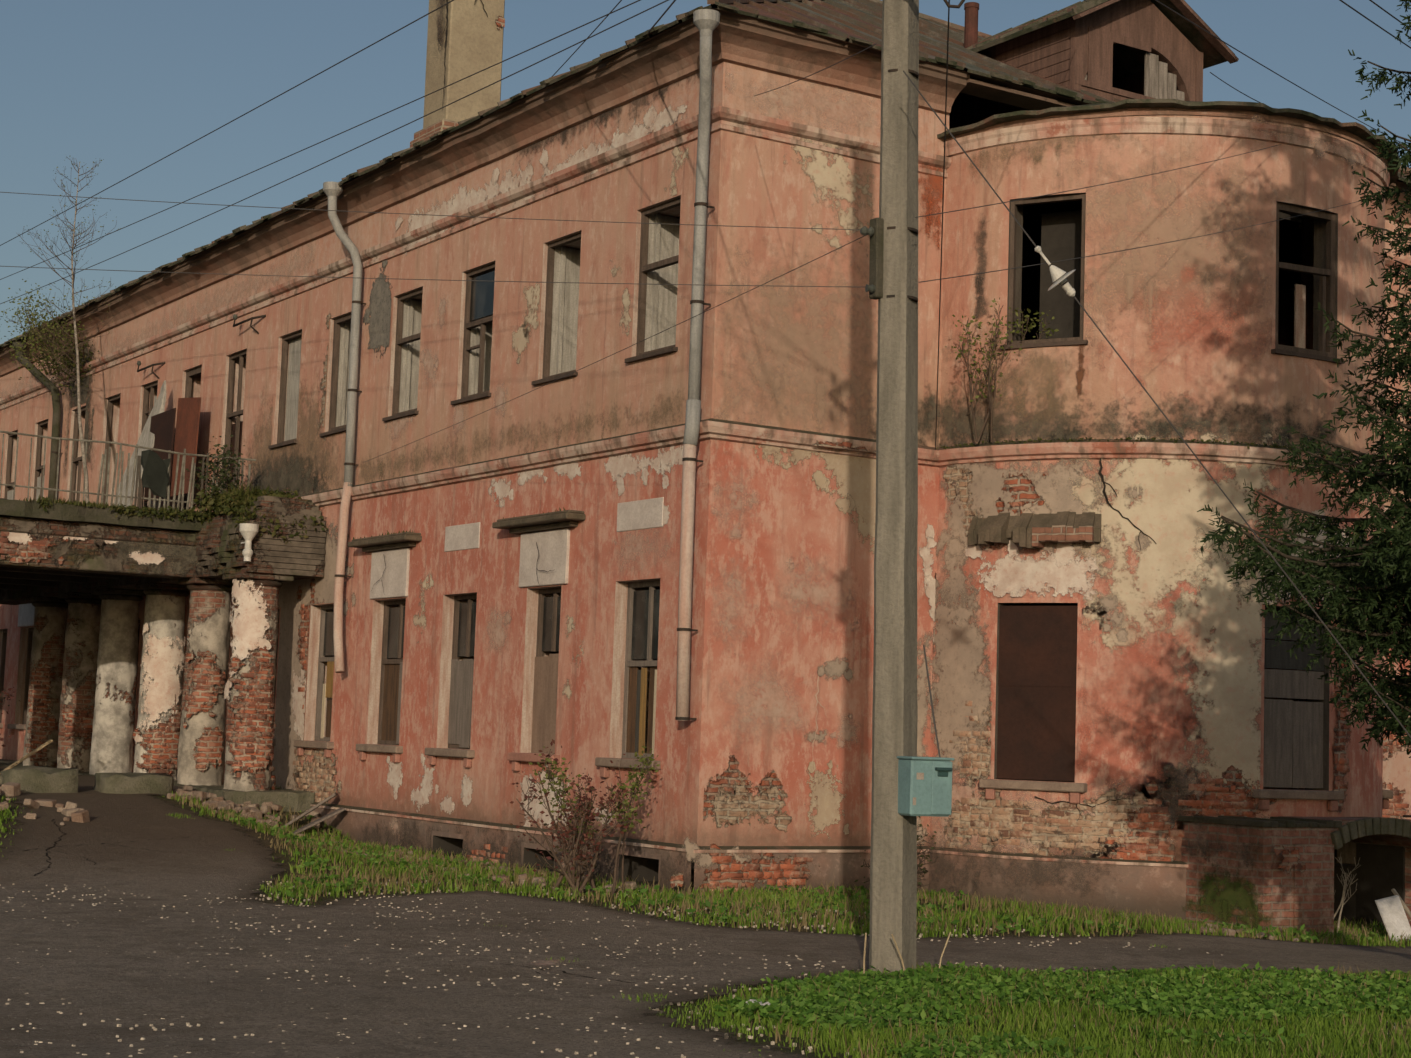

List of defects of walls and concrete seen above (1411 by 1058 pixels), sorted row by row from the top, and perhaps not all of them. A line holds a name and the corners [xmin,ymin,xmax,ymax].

peeling [395,104,689,256]
peeling [783,138,874,249]
spalling [363,259,392,359]
leakage [918,357,1335,450]
spalling [0,532,165,565]
peeling [753,441,876,554]
crack [1098,458,1156,550]
spalling [24,658,94,761]
peeling [917,459,1356,862]
crack [10,819,209,876]
peeling [386,753,474,814]
spalling [669,715,857,894]